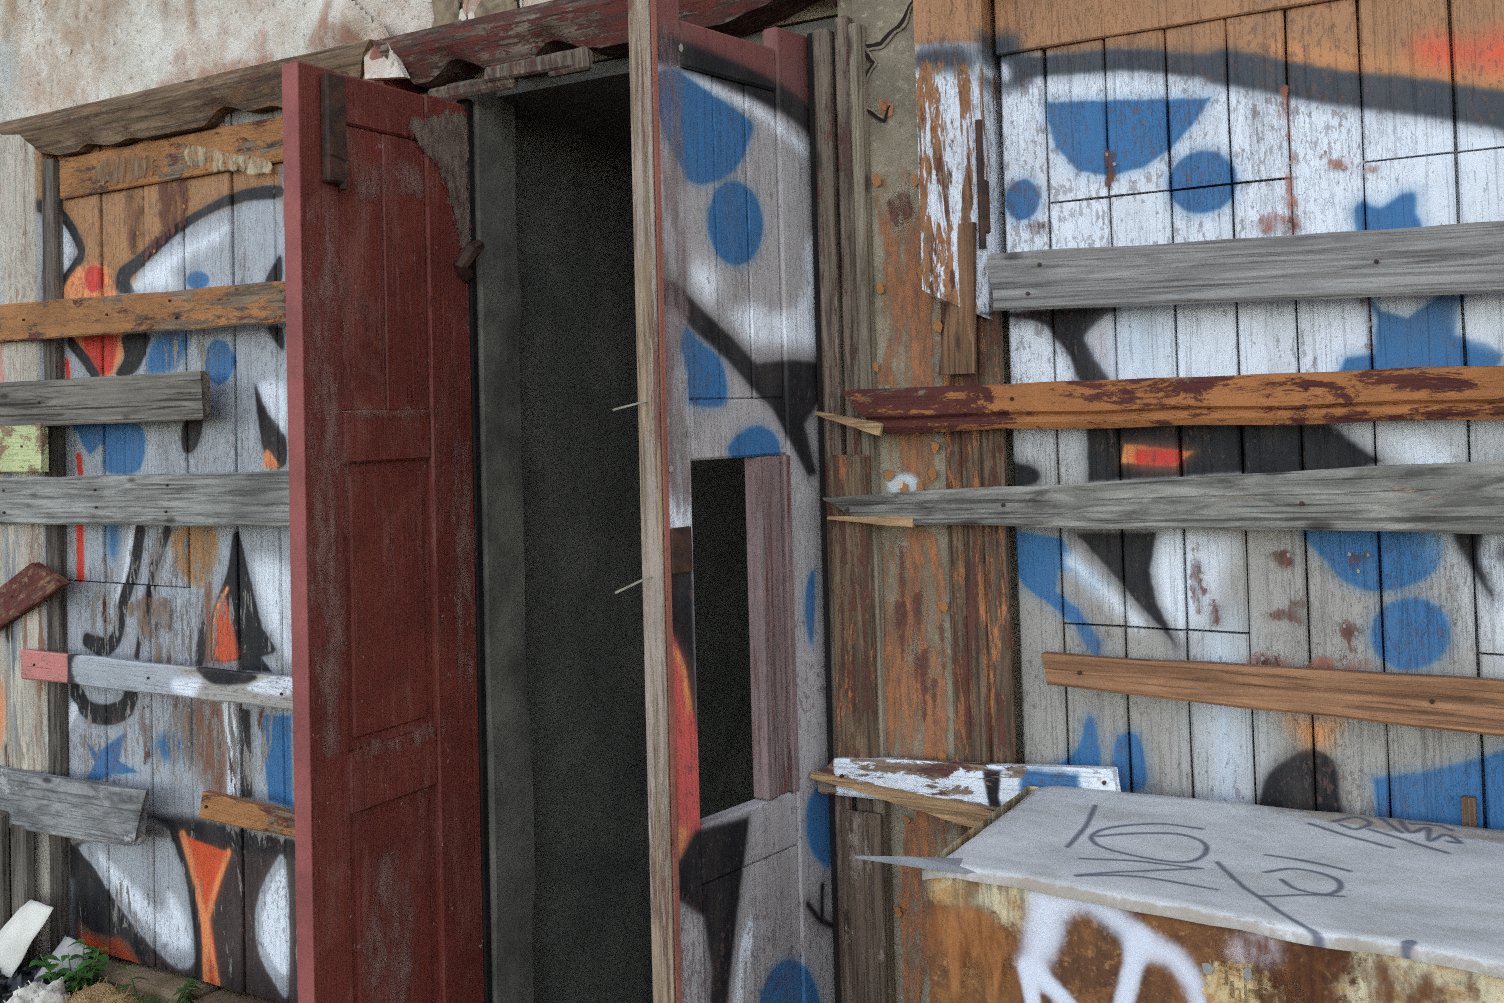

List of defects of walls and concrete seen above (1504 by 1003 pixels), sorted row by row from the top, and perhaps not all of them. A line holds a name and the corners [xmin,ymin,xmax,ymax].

flaking render [426,0,517,29]